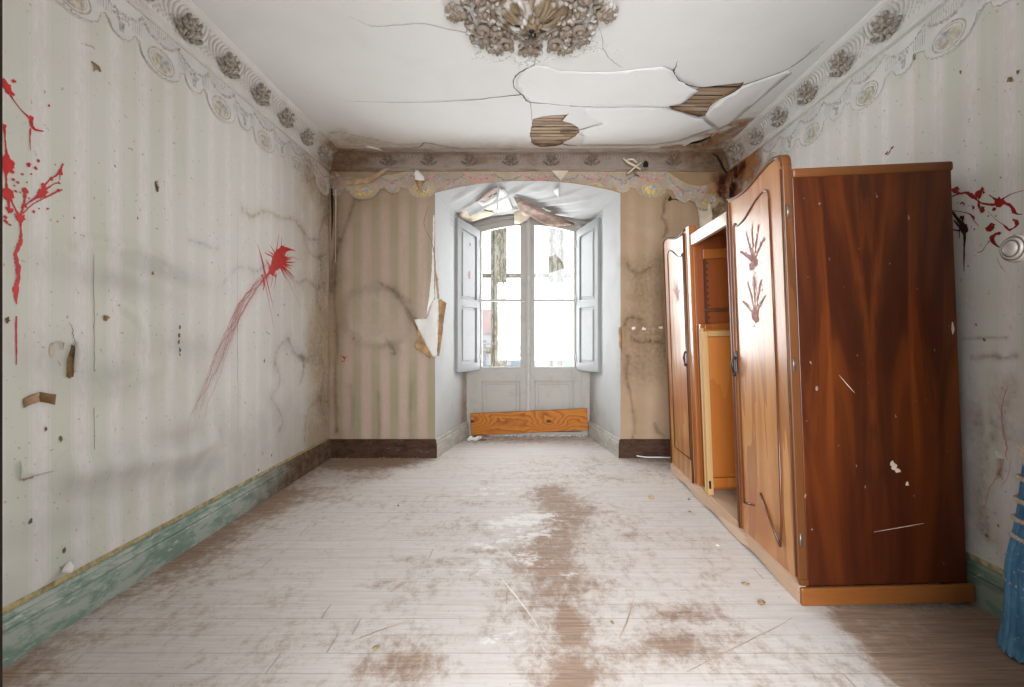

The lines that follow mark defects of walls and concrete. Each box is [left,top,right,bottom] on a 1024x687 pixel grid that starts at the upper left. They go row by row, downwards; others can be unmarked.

crack [443,58,599,136]
flaking render [516,65,792,146]
crack [702,117,728,174]
peeling [49,341,83,379]